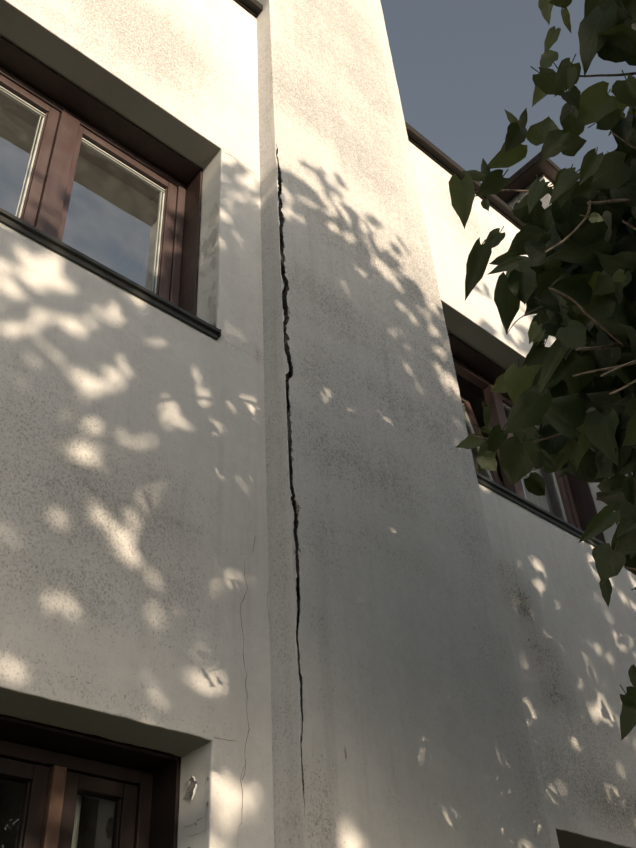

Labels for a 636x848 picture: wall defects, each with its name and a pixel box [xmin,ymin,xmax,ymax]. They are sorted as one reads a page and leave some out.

peeling [200,201,218,327]
crack [205,151,305,843]
peeling [185,766,209,834]